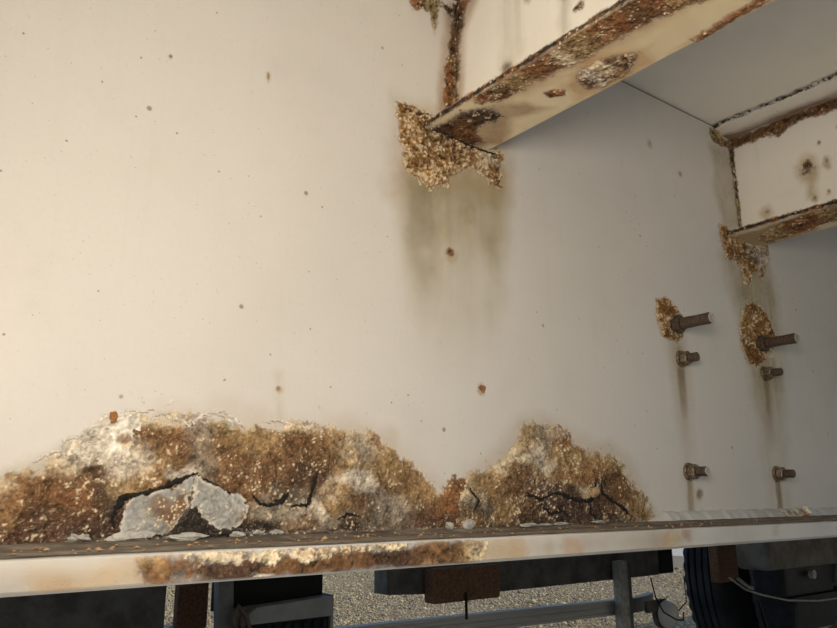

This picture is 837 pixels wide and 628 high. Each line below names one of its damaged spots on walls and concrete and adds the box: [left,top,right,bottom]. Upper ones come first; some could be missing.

rust [691,0,770,42]
rust [395,0,706,200]
rust [709,95,837,408]
rust [656,296,684,351]
peeling [33,395,245,465]
rust [136,540,489,584]